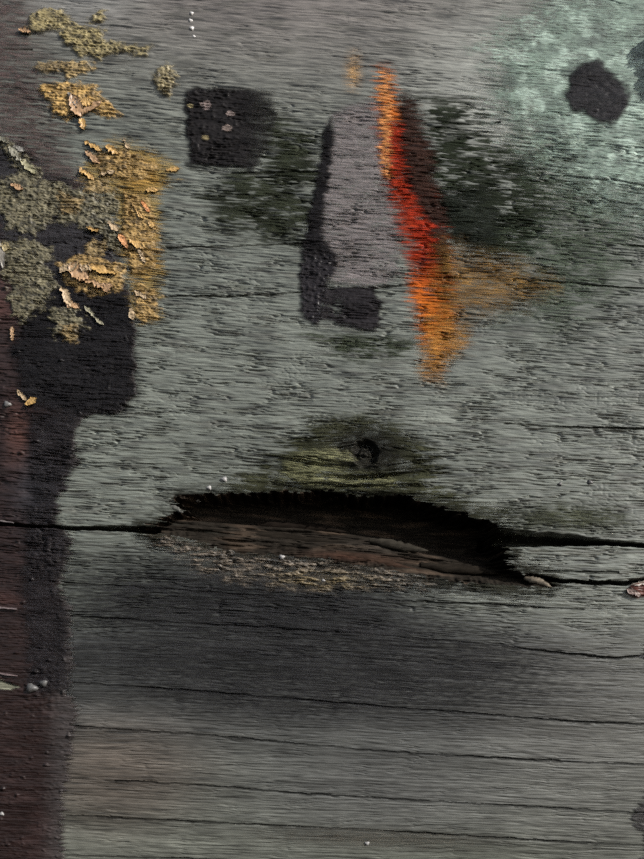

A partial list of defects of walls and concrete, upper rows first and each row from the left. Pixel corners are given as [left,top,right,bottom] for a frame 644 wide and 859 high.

leakage [299,120,337,325]
corrosion [375,70,546,368]
peeling [0,1,138,859]
crack [57,525,148,534]
crack [494,534,644,548]
crack [63,580,117,588]
crack [535,570,644,587]
peeling [626,580,644,597]
crack [316,596,585,610]
peeling [631,803,644,835]